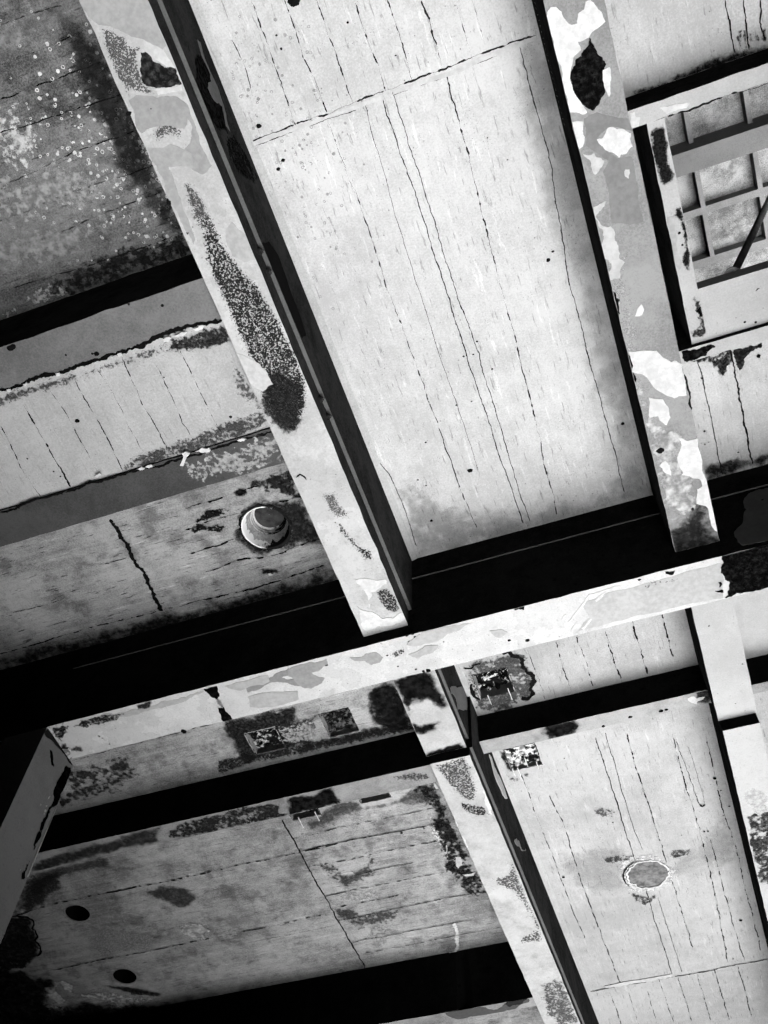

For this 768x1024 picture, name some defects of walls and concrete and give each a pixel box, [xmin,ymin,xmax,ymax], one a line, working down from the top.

water stain [0,10,190,304]
peeling [79,0,212,244]
water stain [0,183,321,555]
crack [0,474,324,654]
crack [252,0,624,527]
peeling [547,0,644,314]
peeling [628,344,715,425]
peeling [656,430,717,531]
crack [12,808,500,973]
water stain [218,684,414,773]
water stain [379,757,542,943]
crack [521,733,767,1023]